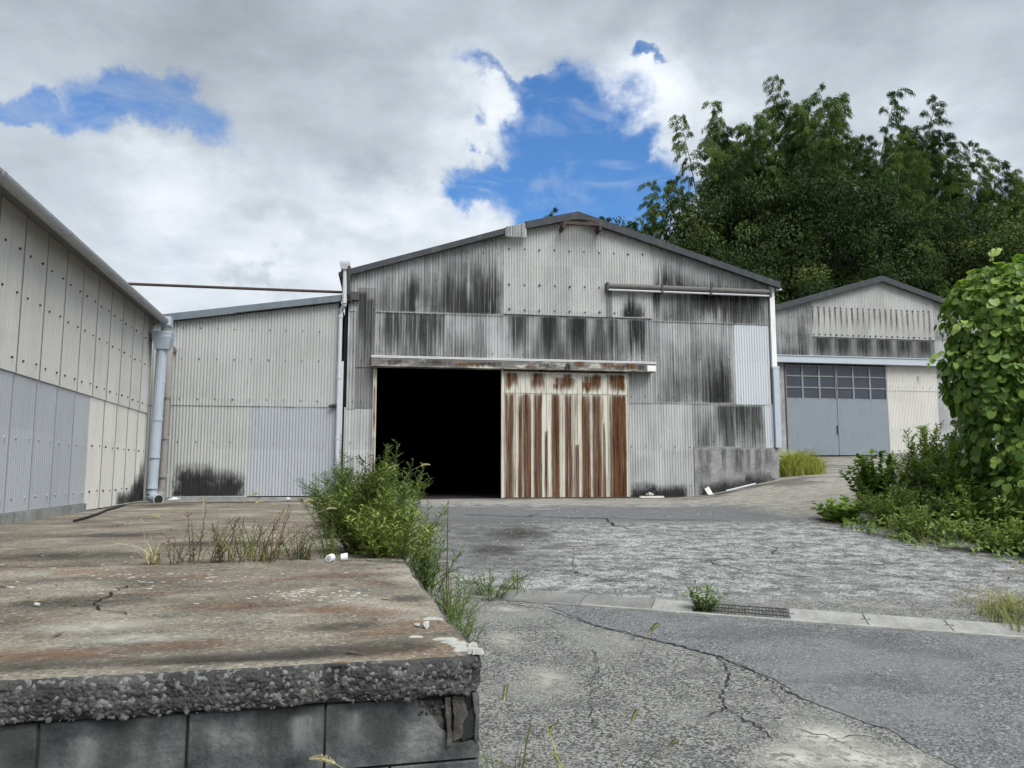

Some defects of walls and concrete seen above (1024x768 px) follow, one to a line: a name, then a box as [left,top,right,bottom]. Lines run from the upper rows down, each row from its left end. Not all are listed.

water stain [359,279,496,364]
water stain [512,317,523,346]
water stain [540,302,645,368]
water stain [654,272,760,322]
water stain [801,338,930,355]
corrosion [505,362,635,497]
water stain [703,366,761,446]
water stain [117,472,243,506]
crack [27,558,292,614]
crack [484,558,801,751]
spalling [0,635,485,746]
crack [797,728,888,757]